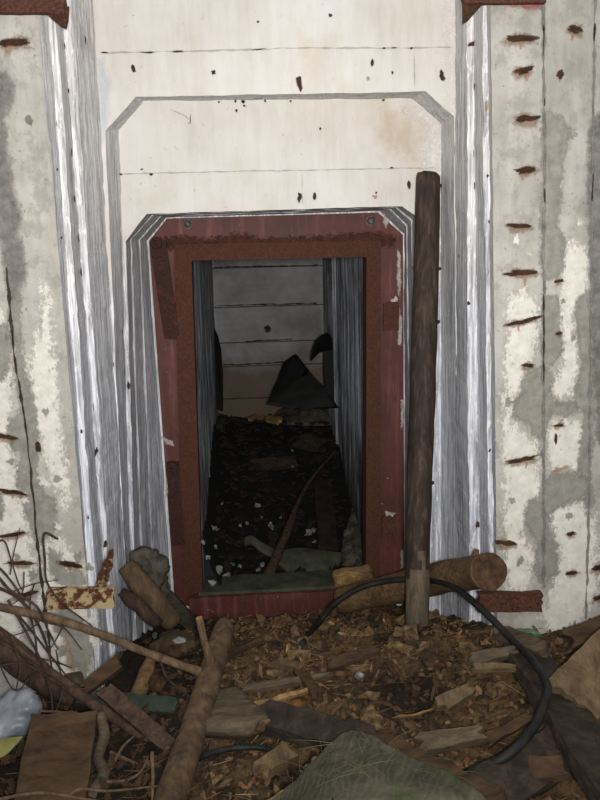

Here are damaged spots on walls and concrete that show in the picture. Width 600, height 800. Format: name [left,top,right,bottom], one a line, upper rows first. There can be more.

water stain [0,73,26,300]
corrosion [160,230,396,251]
water stain [587,115,600,444]
corrosion [95,540,114,587]